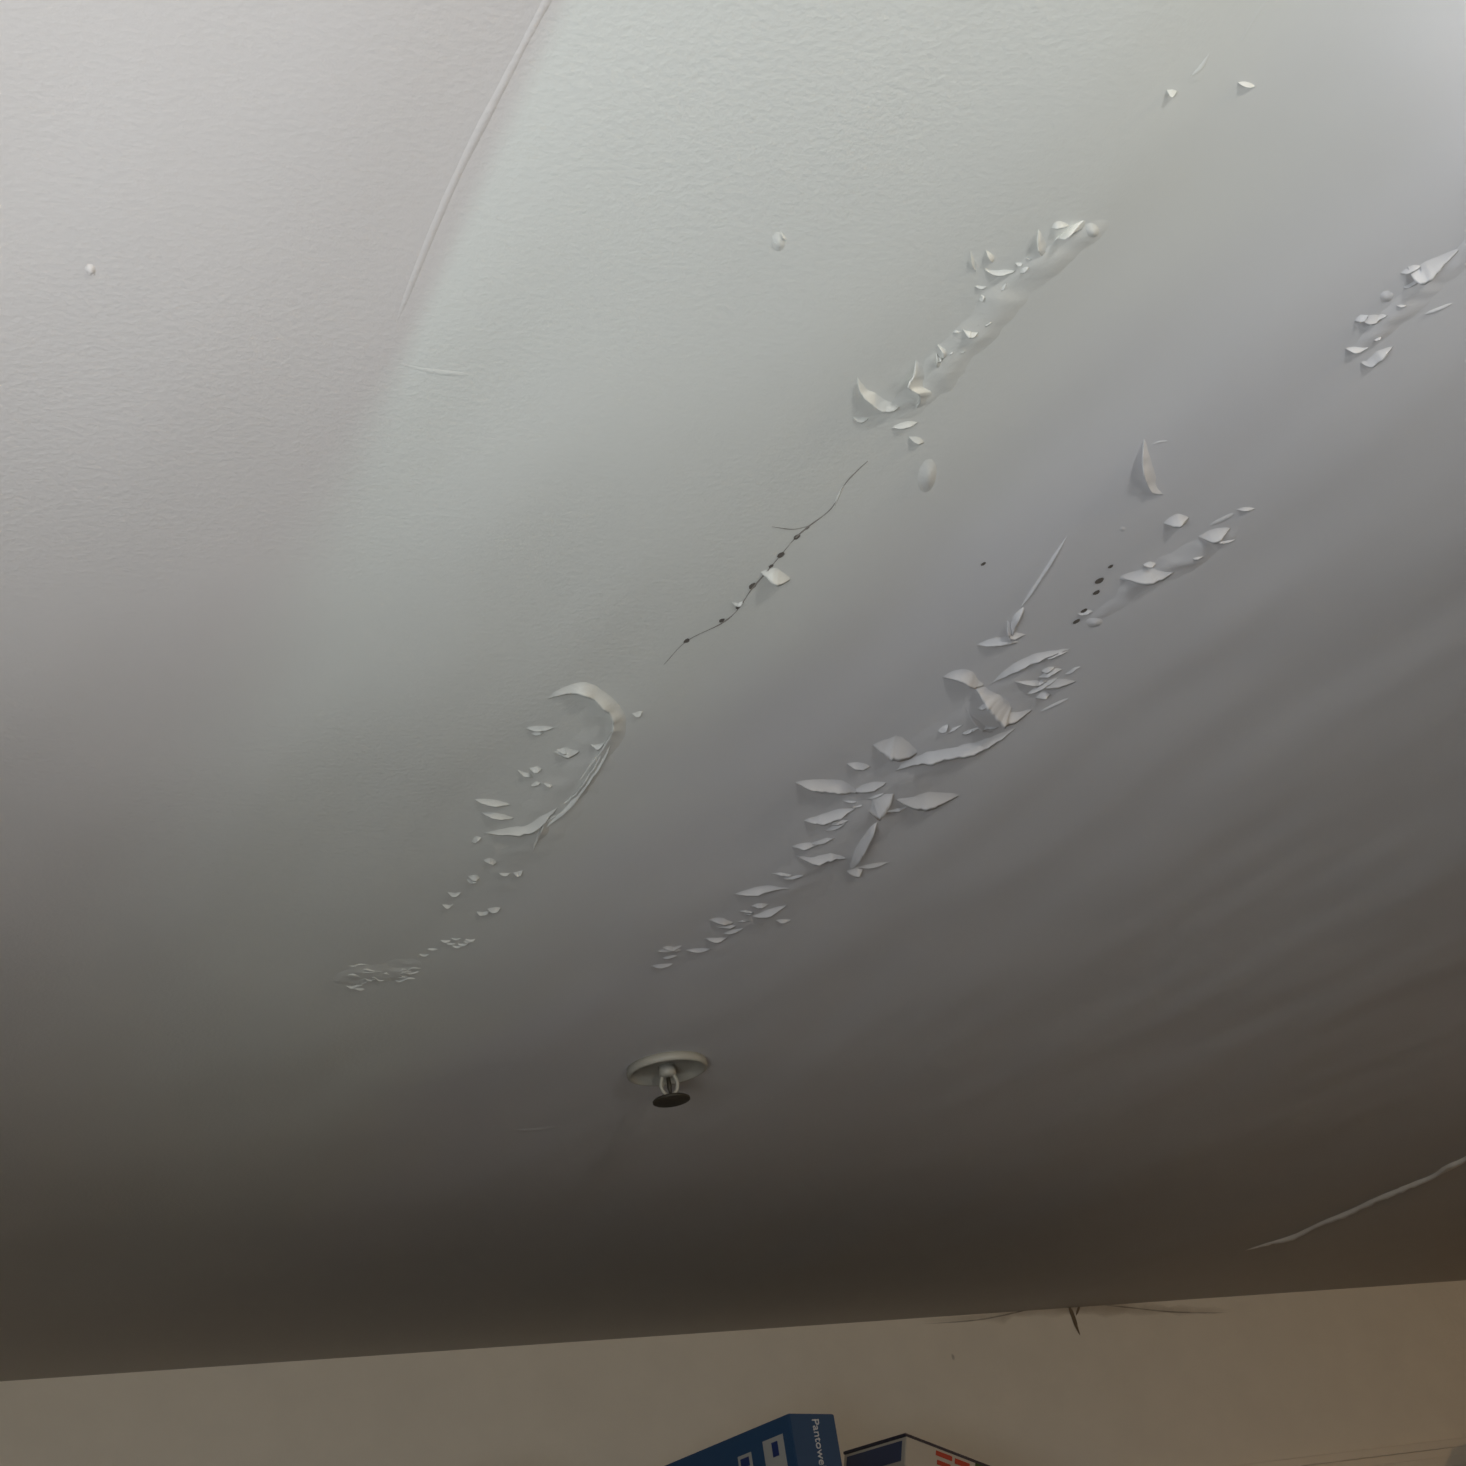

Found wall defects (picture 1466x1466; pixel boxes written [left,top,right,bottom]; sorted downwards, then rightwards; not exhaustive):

peeling [853,219,1109,493]
peeling [1346,239,1466,368]
crack [665,461,868,663]
peeling [442,682,643,916]
peeling [652,537,1080,969]
crack [1248,1156,1466,1250]